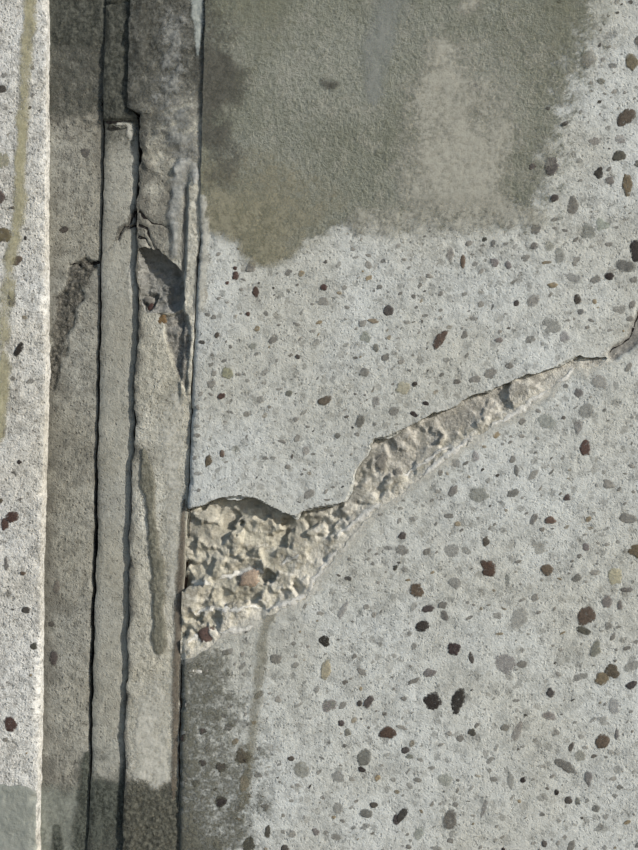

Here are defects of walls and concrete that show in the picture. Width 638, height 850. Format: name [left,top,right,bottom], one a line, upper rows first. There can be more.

crack [99,99,166,267]
damp [351,37,549,235]
crack [609,312,638,360]
spalling [127,247,616,675]
crack [91,473,99,739]
damp [40,649,272,850]